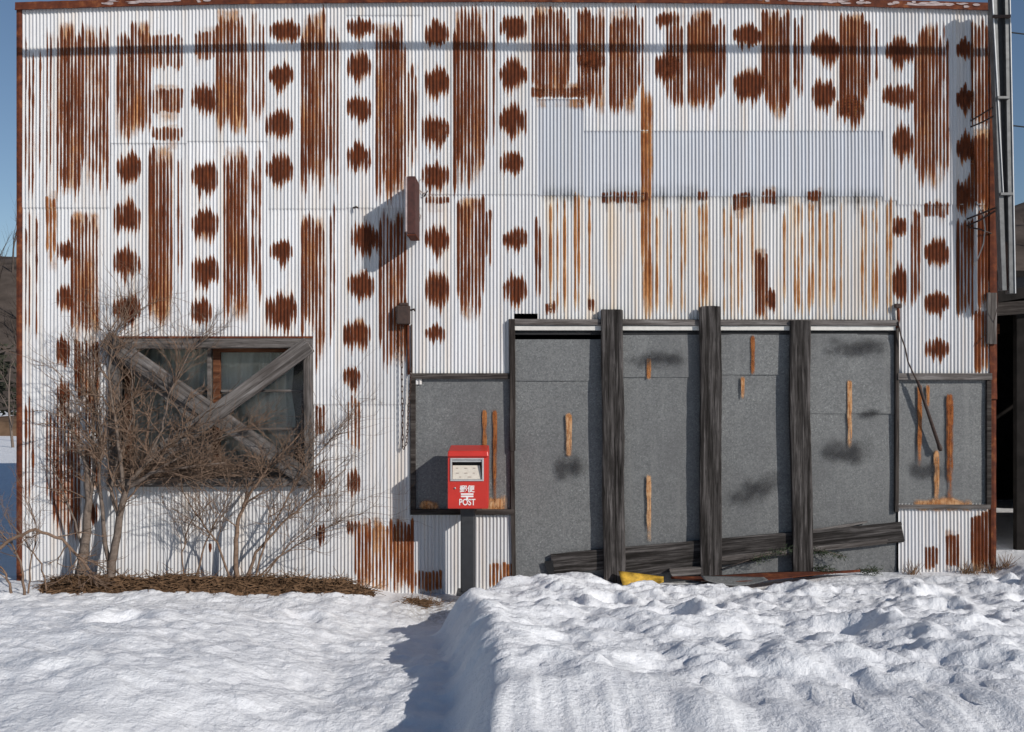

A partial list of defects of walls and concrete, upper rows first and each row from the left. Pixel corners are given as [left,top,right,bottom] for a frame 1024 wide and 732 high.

rust [25,4,990,538]
rust [347,517,442,593]